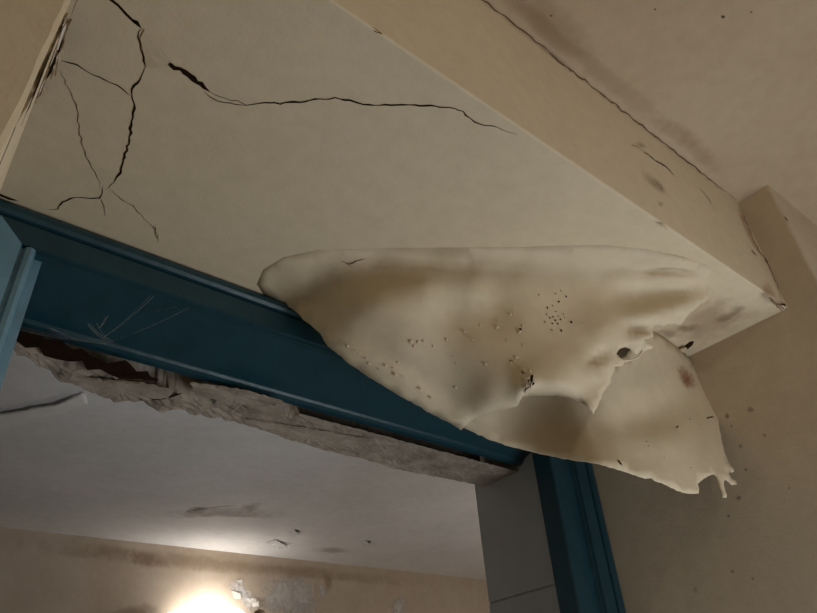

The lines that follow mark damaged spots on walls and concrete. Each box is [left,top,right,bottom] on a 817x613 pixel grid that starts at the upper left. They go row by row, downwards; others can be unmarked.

crack [21,0,517,240]
crack [482,0,782,298]
spalling [0,331,518,487]
peeling [464,331,737,498]
peeling [232,579,315,613]